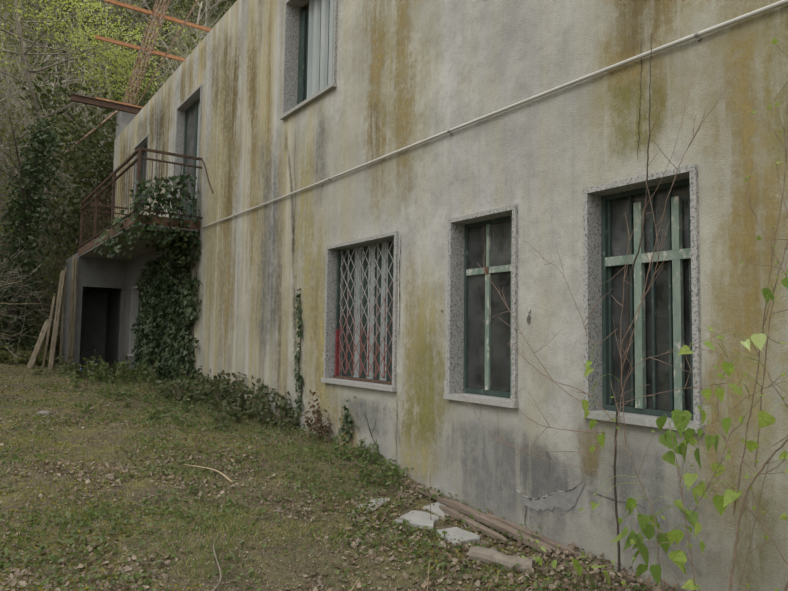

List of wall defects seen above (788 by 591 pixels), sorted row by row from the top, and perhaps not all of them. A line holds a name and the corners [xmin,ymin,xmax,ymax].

damp [198,38,257,337]
damp [249,138,335,416]
damp [402,300,442,475]